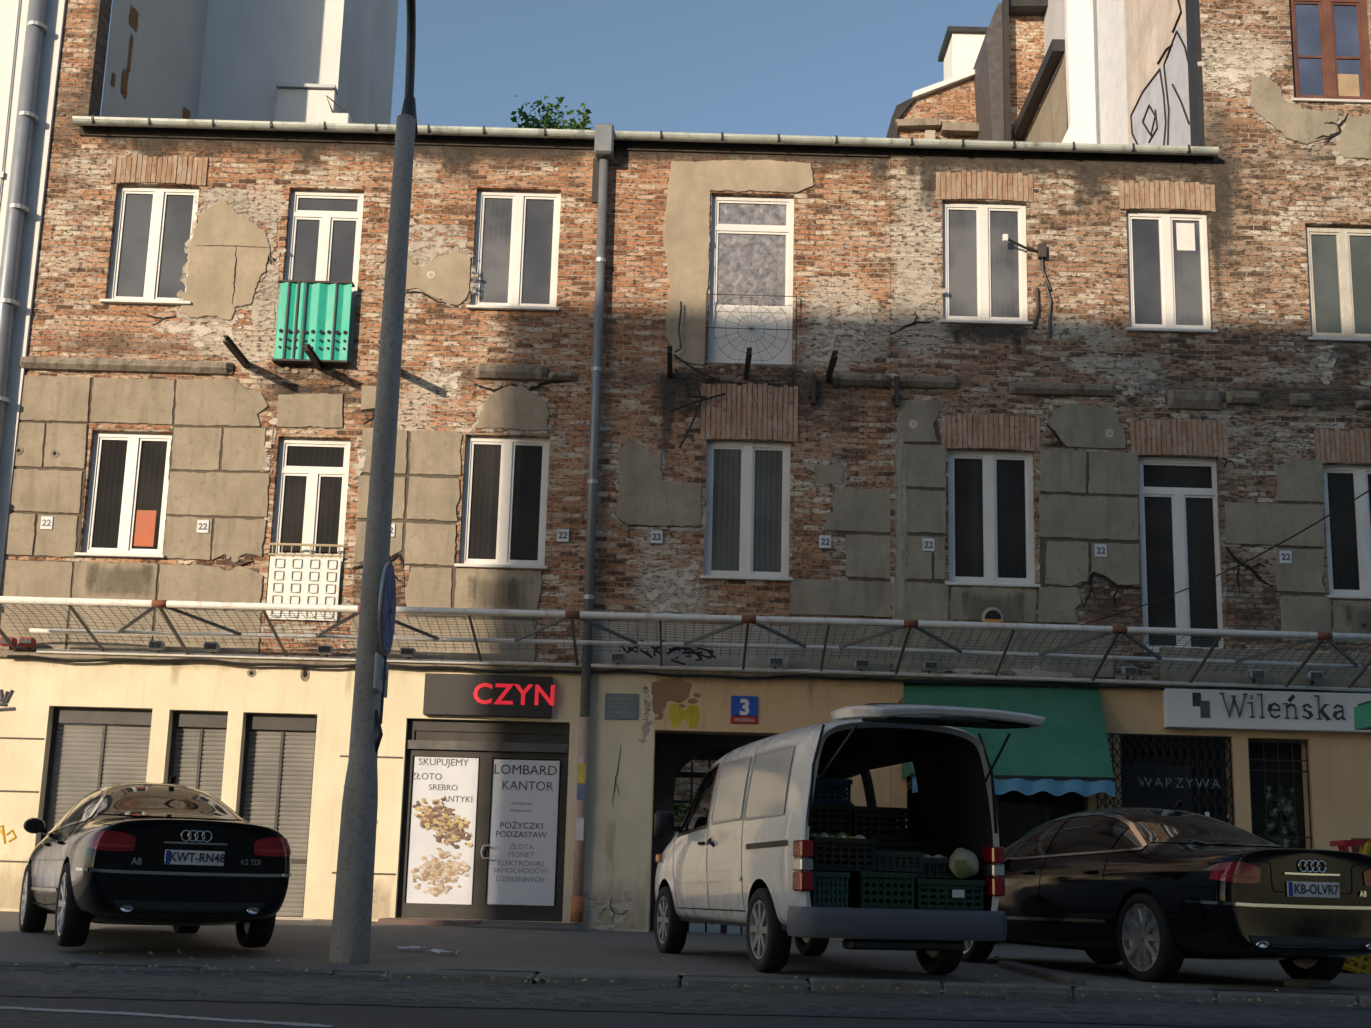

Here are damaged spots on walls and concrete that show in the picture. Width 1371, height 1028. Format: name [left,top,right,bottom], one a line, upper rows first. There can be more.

rust [111,5,139,99]
peeling [1197,42,1371,167]
crack [1315,113,1349,144]
peeling [155,183,287,347]
peeling [375,257,386,281]
peeling [406,217,479,309]
peeling [706,263,947,385]
peeling [470,381,557,435]
peeling [610,435,709,534]
crack [352,553,402,582]
crack [1078,572,1141,612]
crack [1225,546,1275,591]